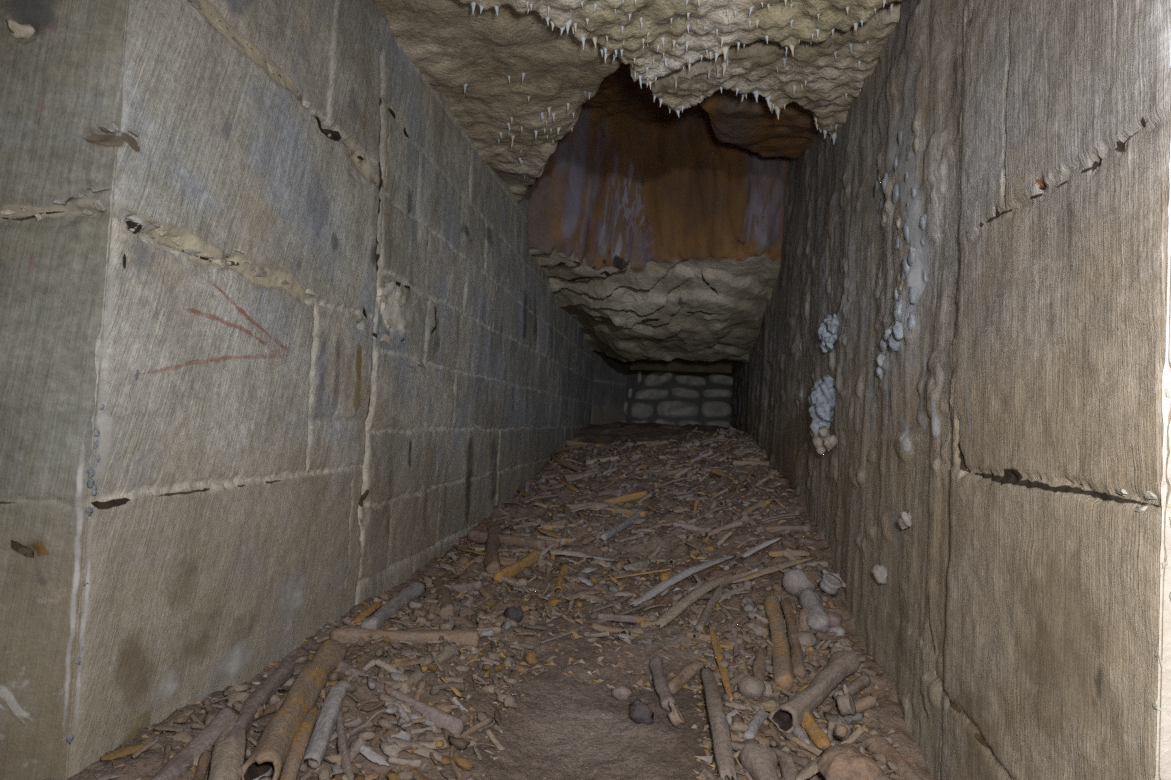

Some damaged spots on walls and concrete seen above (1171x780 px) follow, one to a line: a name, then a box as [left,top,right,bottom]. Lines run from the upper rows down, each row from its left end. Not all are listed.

crack [0,203,70,223]
damp [815,191,842,353]
damp [860,29,940,451]
crack [958,117,1148,239]
damp [807,375,838,455]